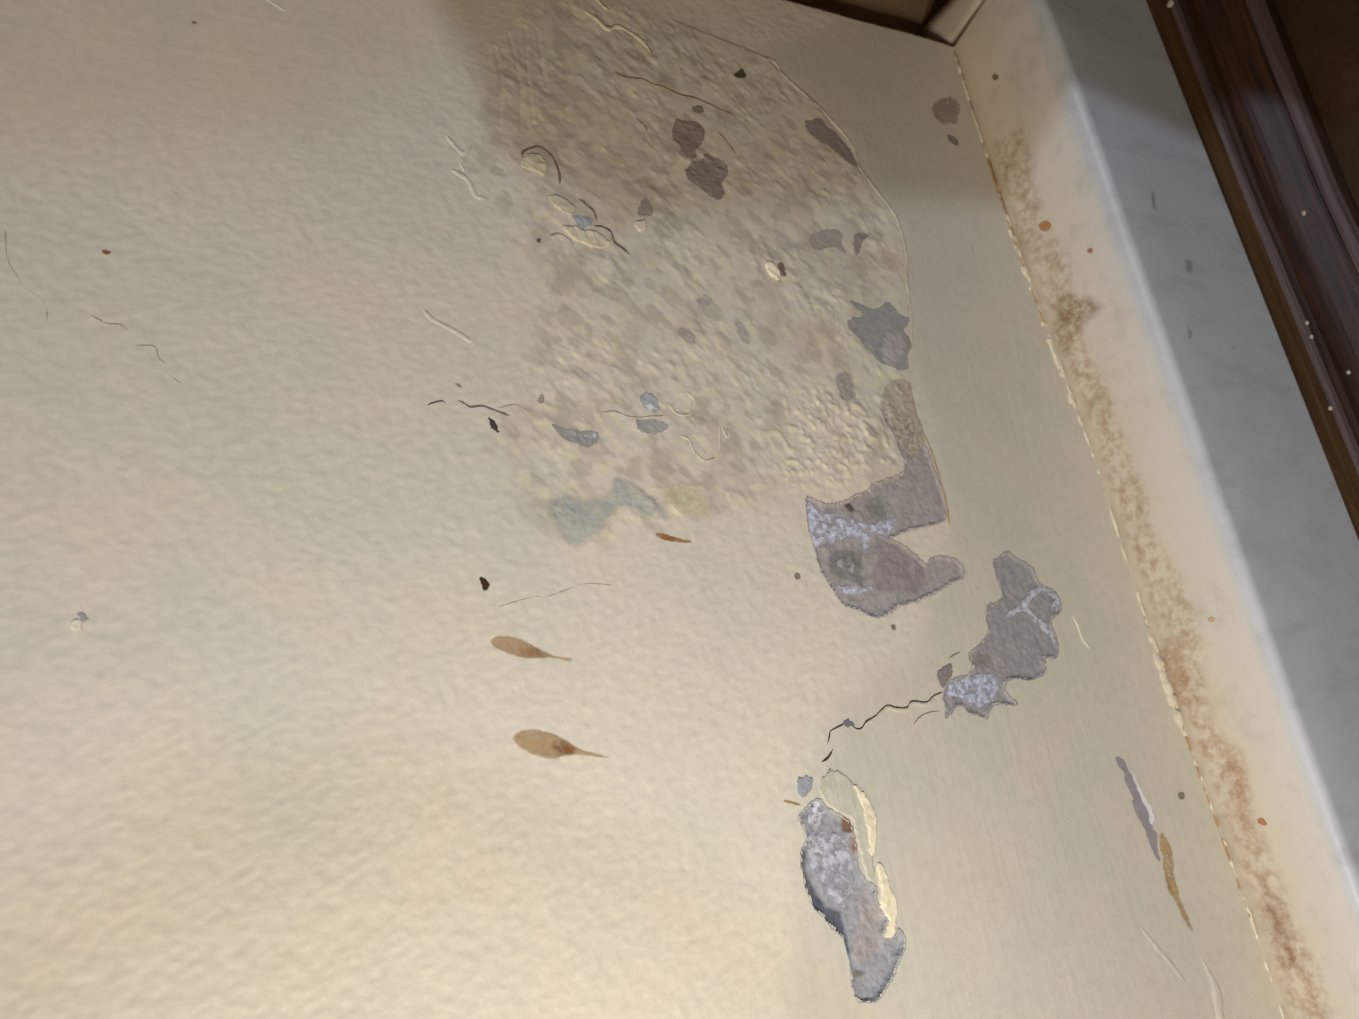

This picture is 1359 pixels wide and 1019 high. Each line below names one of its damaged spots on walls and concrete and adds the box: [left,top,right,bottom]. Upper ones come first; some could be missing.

peeling [672,105,728,200]
peeling [805,119,858,167]
leakage [556,480,707,543]
flaking render [805,301,965,619]
flaking render [937,551,1062,720]
crack [822,692,942,771]
flaking render [797,770,906,1004]
peeling [1116,757,1192,929]
leakage [1182,727,1251,918]